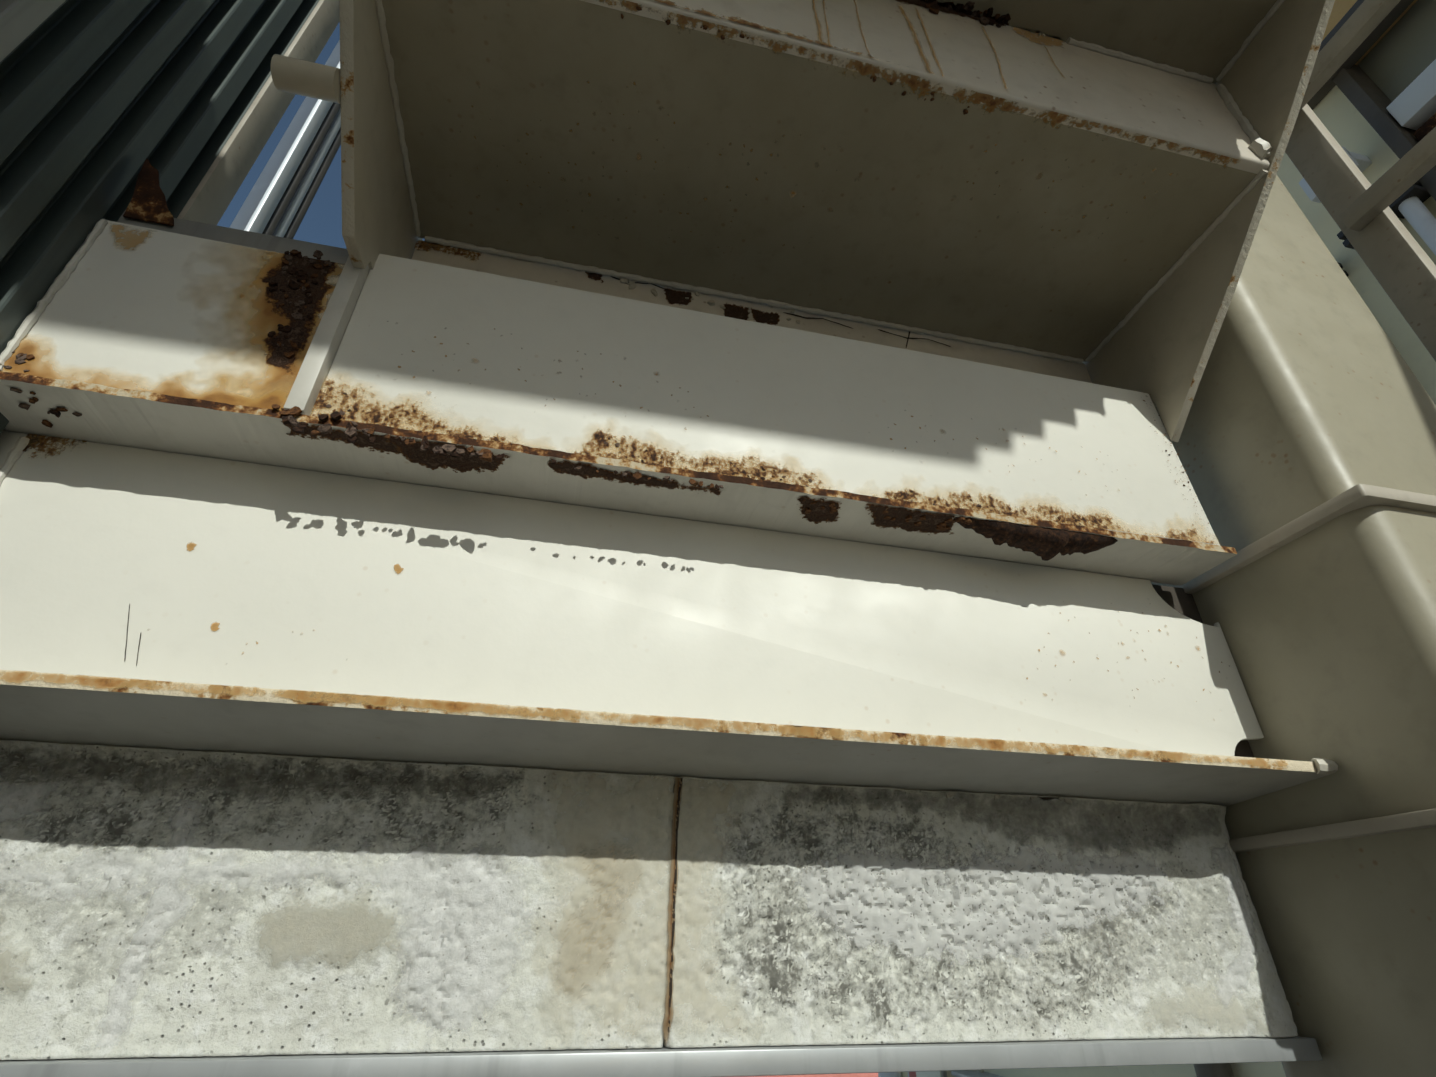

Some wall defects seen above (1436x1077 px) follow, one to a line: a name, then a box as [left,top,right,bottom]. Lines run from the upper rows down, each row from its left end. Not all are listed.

rust [599,0,1238,167]
rust [0,249,511,473]
rust [547,429,842,524]
rust [865,400,1214,544]
rust [0,671,257,696]
rust [279,689,1288,767]
leakage [0,802,526,1047]
leakage [560,804,634,991]
crack [663,777,683,1041]
leakage [801,793,1214,962]
leakage [1214,847,1255,1003]